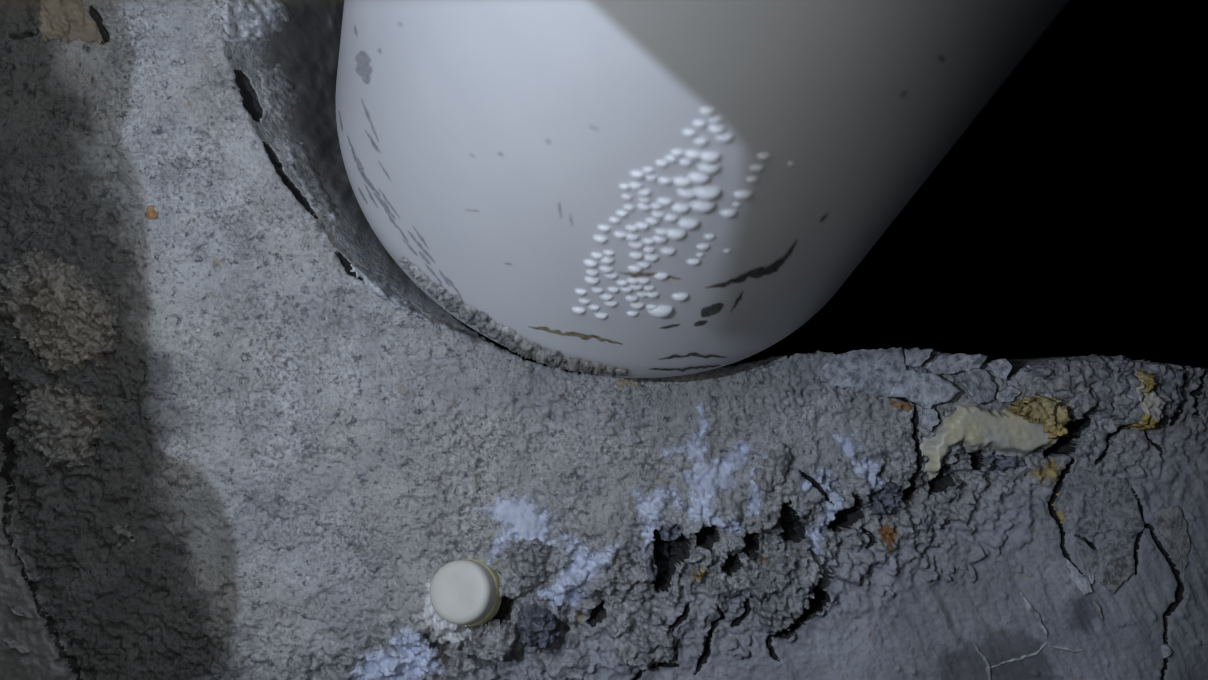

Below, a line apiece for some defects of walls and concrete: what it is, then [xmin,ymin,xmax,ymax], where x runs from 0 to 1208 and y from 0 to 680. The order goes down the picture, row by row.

crack [9,31,34,39]
peeling [820,347,1187,456]
crack [0,342,82,680]
efflorescence [347,579,473,680]
spalling [469,538,565,662]
efflorescence [472,494,620,611]
spalling [645,524,721,593]
efflorescence [631,402,768,556]
spalling [714,500,831,640]
leakage [799,468,844,565]
crack [1048,365,1208,574]
crack [1131,488,1185,680]